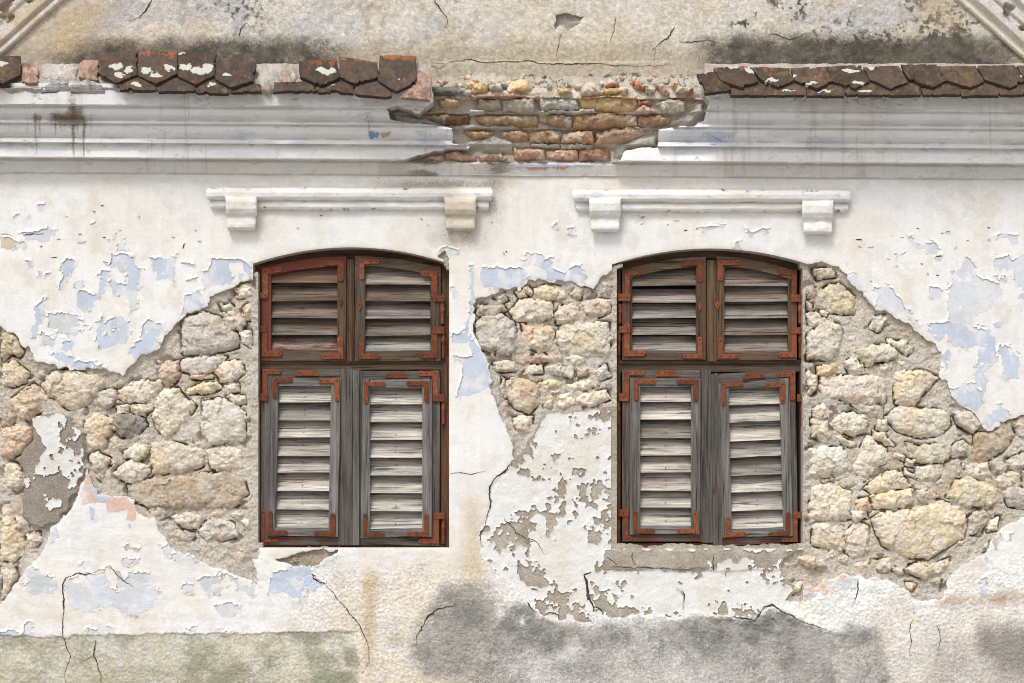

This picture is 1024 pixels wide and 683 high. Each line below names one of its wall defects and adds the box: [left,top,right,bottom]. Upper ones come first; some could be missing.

crack [431,19,742,68]
leakage [702,0,1017,64]
leakage [35,93,86,155]
spalling [357,70,740,170]
peeling [667,220,726,233]
flaking render [0,200,341,639]
flaking render [437,224,1024,625]
crack [451,463,543,551]
crack [53,566,129,682]
crack [311,565,370,668]
leakage [412,582,889,683]
leakage [941,623,1024,683]